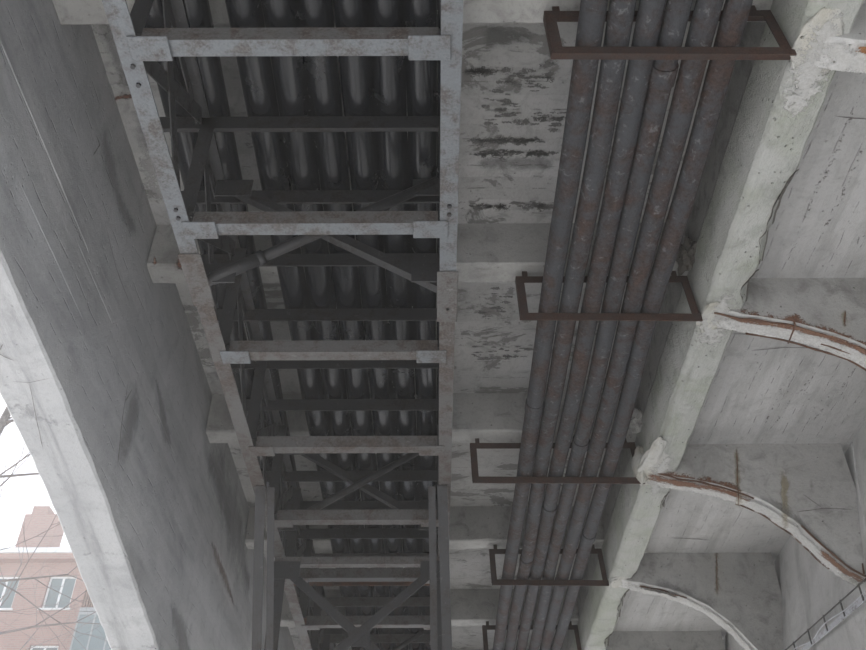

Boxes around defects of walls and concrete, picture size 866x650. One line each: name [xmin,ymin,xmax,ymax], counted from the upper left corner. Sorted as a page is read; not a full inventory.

spalling [814,42,866,73]
crack [808,96,866,234]
spalling [712,169,866,371]
spalling [647,456,866,584]
spalling [616,571,751,650]